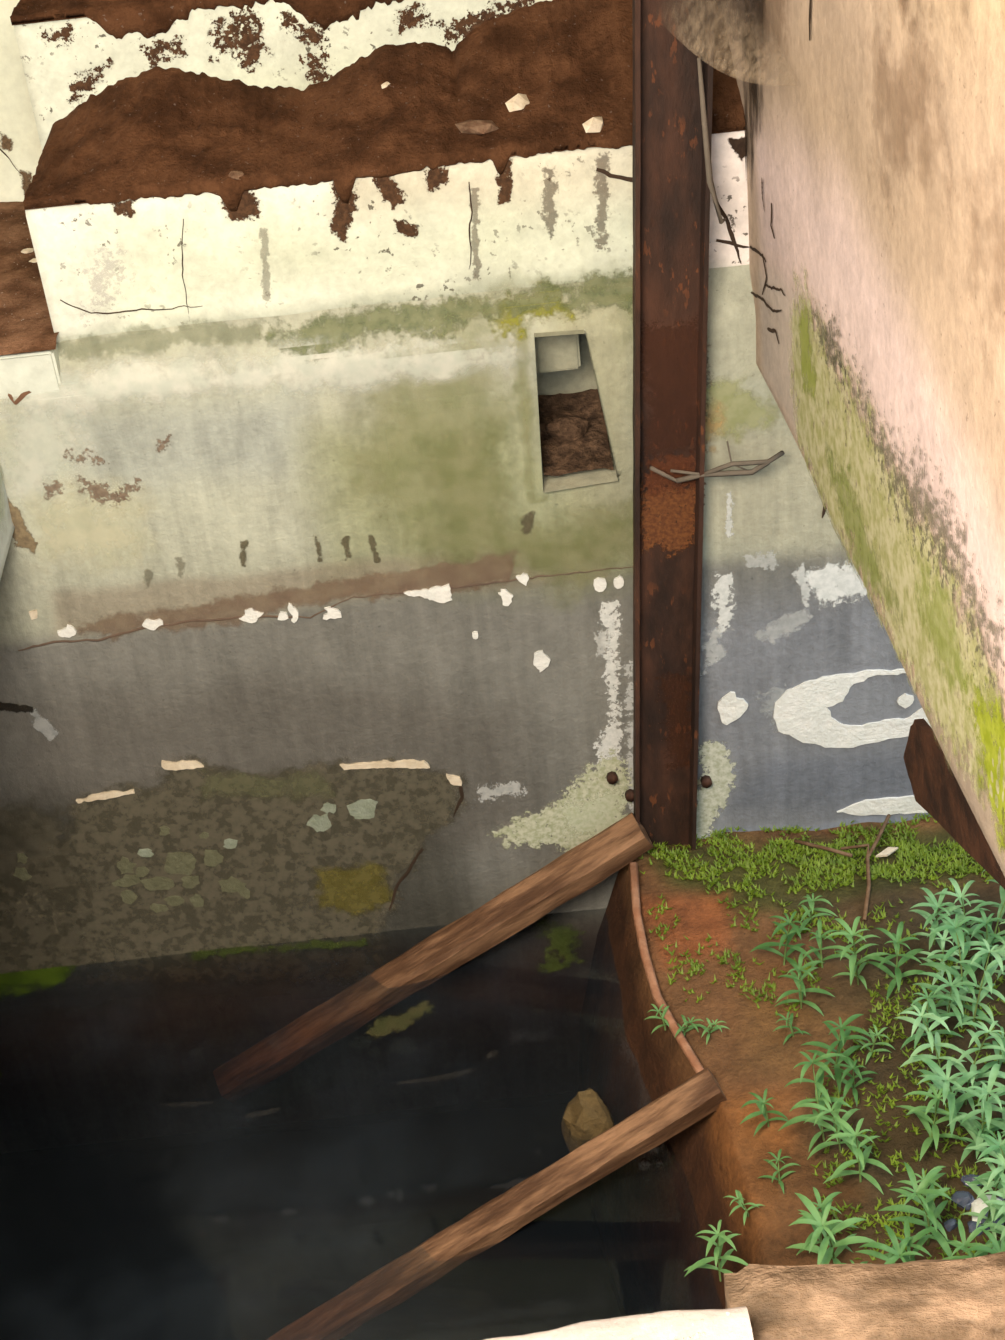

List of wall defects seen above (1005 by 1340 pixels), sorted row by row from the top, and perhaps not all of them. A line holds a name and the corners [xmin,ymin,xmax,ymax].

peeling [68,57,114,104]
peeling [139,34,188,68]
peeling [206,6,333,85]
peeling [394,0,535,46]
leakage [741,0,763,175]
crack [806,0,814,40]
crack [716,202,785,344]
corrosion [640,451,706,558]
spalling [697,264,932,837]
leakage [792,561,867,607]
leakage [808,298,1005,695]
spalling [0,281,633,1168]